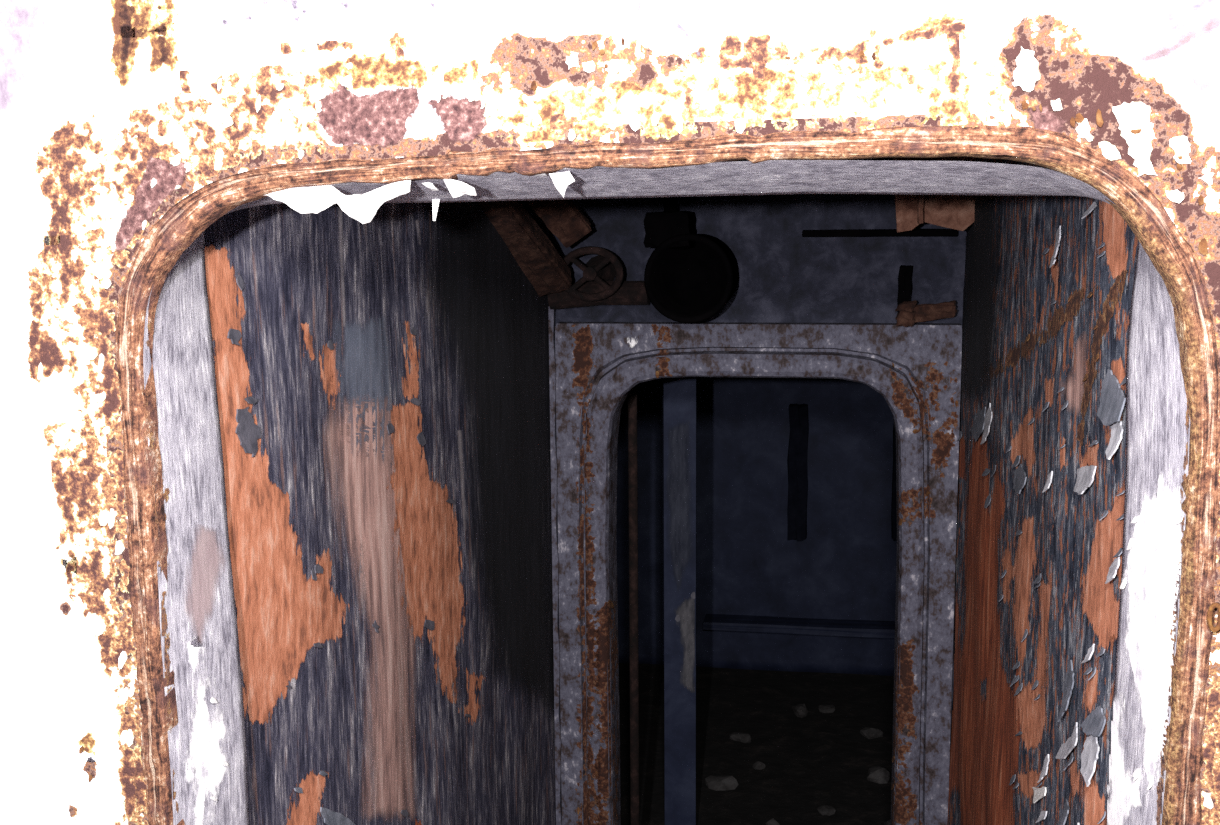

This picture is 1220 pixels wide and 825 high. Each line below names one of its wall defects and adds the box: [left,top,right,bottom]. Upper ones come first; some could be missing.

peeling [185,244,355,825]
rust [27,32,521,825]
peeling [263,179,477,224]
peeling [301,318,486,817]
peeling [535,171,575,197]
rust [571,324,619,825]
rust [475,13,1220,368]
rust [889,361,959,526]
peeling [947,335,1183,825]
peeling [1081,202,1128,279]
rust [1156,376,1189,825]
rust [1200,504,1220,825]